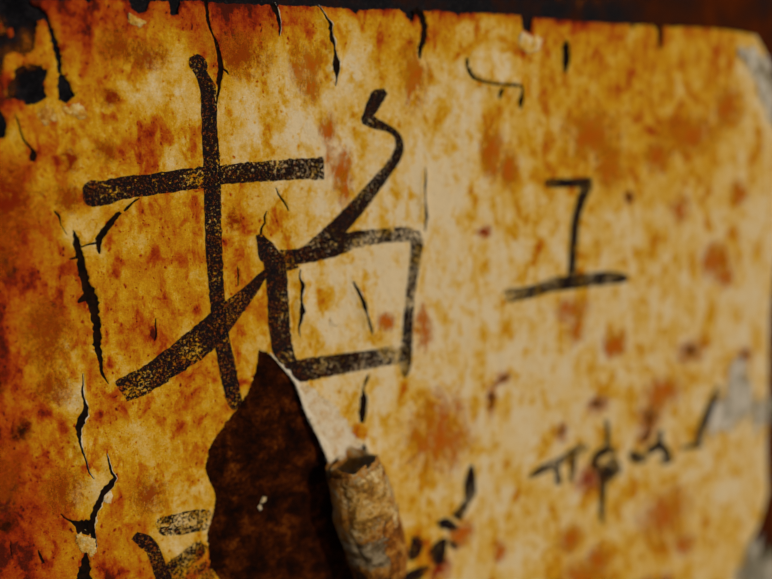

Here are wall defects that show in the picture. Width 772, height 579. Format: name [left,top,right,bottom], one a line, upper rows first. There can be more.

peeling [0,0,89,125]
crack [203,0,229,102]
rust [290,43,321,101]
crack [317,5,341,86]
rust [402,41,430,104]
rust [319,117,352,201]
rust [480,129,519,187]
rust [24,300,70,407]
crack [53,198,140,579]
rust [379,313,394,331]
rust [414,303,432,351]
peeling [351,422,368,441]